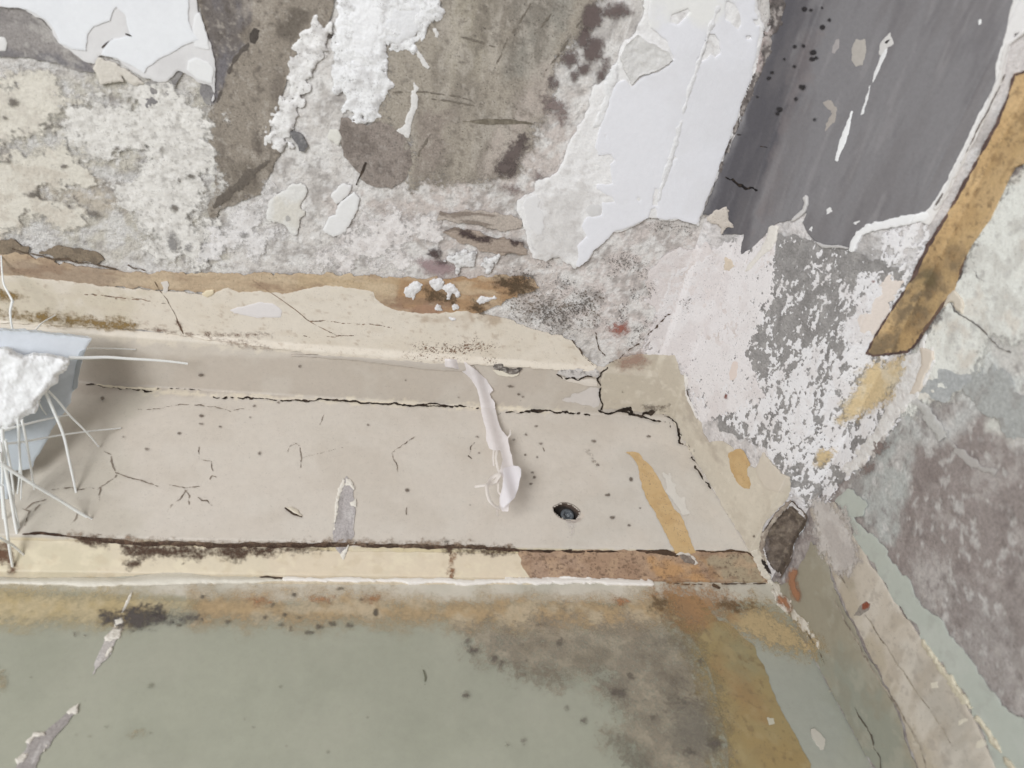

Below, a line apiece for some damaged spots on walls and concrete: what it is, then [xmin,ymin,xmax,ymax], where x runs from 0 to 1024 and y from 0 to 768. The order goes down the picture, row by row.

water stain [424,288,457,304]
peeling [0,0,1024,587]
water stain [494,249,656,367]
crack [22,447,216,522]
crack [86,314,711,489]
water stain [0,586,828,768]